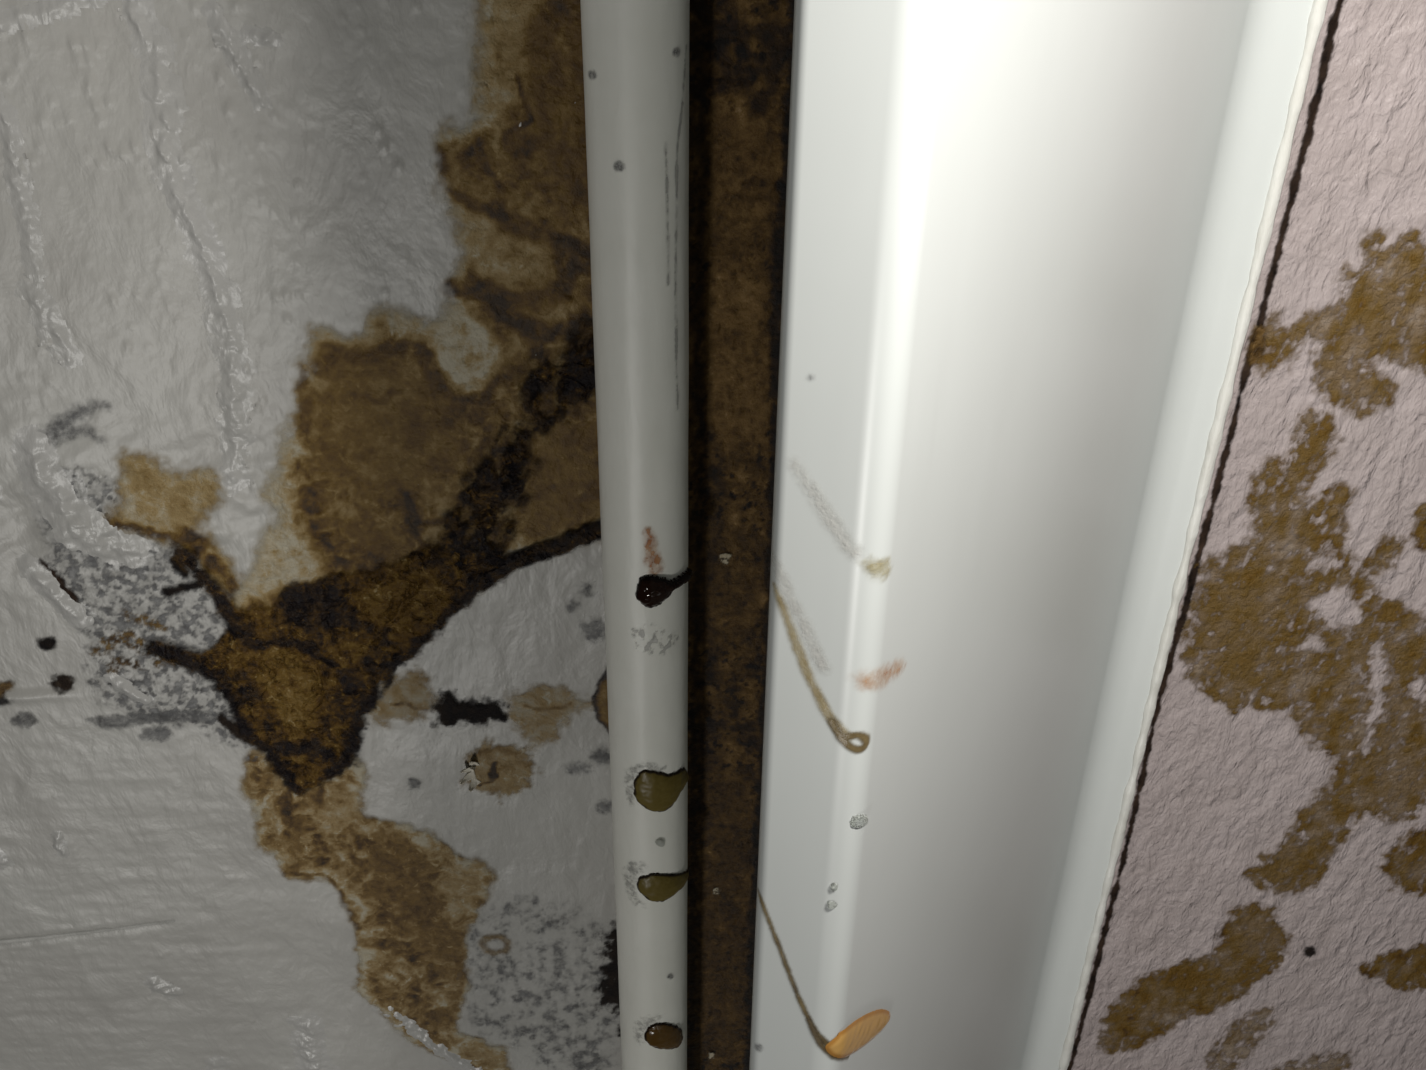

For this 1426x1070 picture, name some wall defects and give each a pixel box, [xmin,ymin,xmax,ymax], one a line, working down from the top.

water stain [44,0,621,1070]
crack [1067,0,1344,1070]
water stain [1098,229,1426,1070]